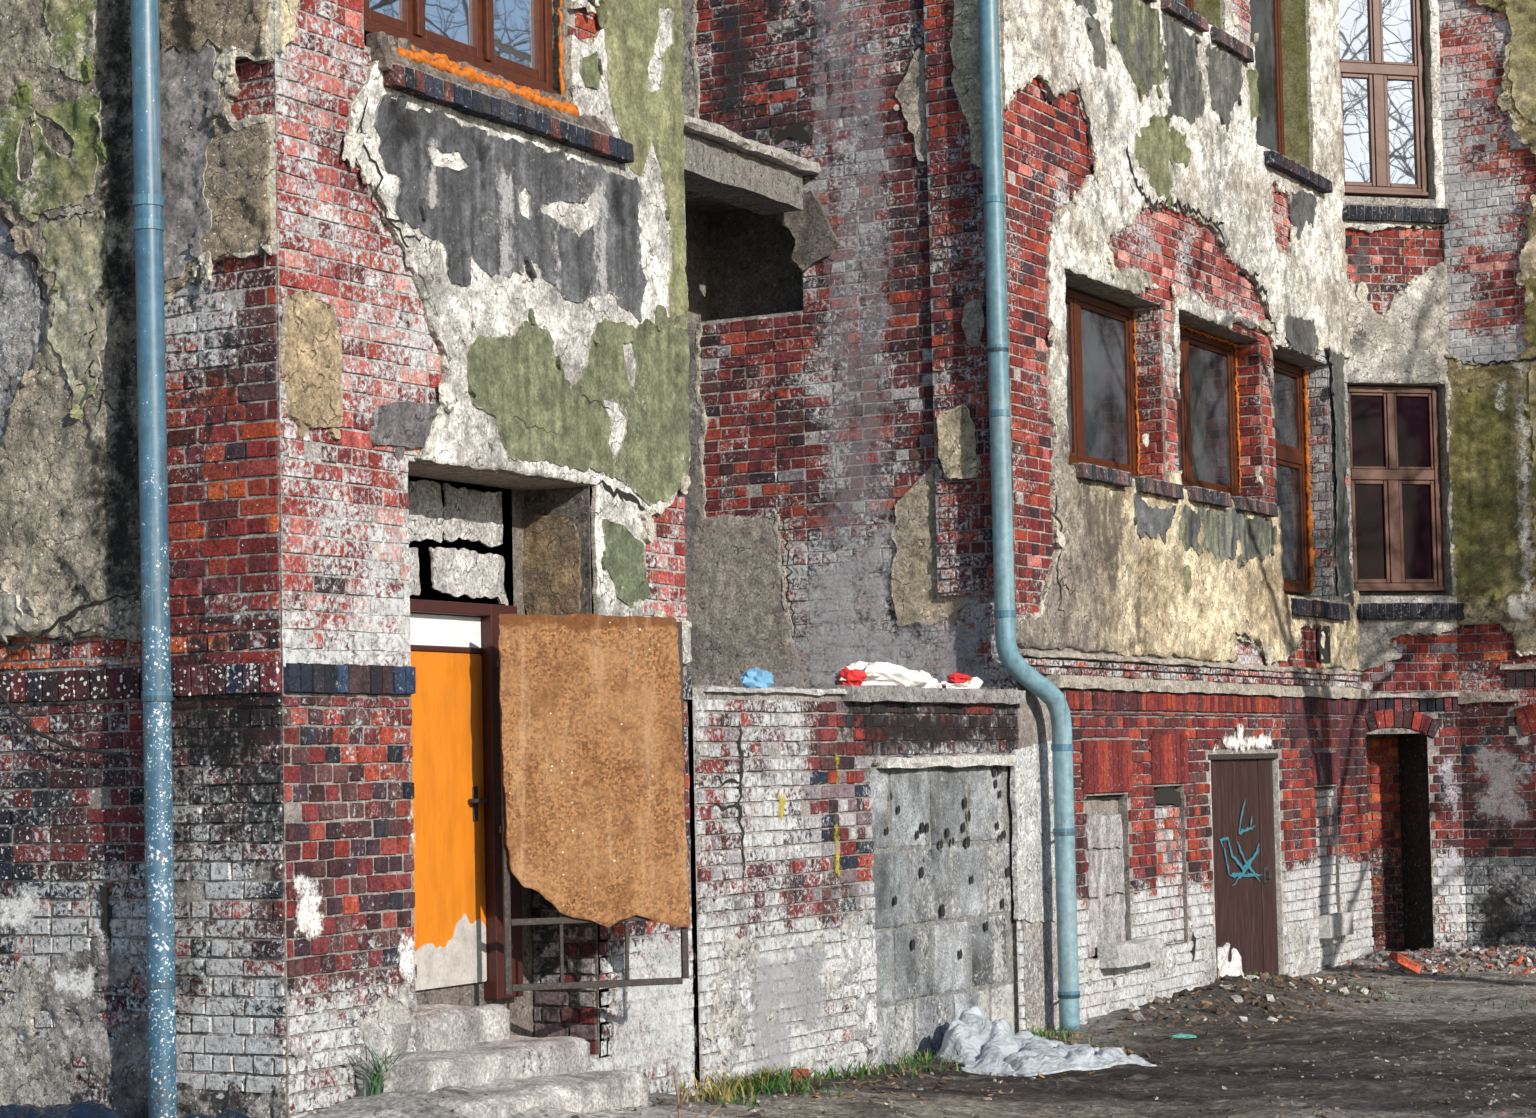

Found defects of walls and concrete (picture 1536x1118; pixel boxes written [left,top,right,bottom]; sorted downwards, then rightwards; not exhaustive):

peeling [0,0,118,440]
spalling [164,0,1018,716]
spalling [1003,69,1104,620]
spalling [1074,0,1358,606]
spalling [1232,618,1325,679]
spalling [1345,0,1536,601]
spalling [1355,623,1536,708]
leakage [1495,363,1536,621]